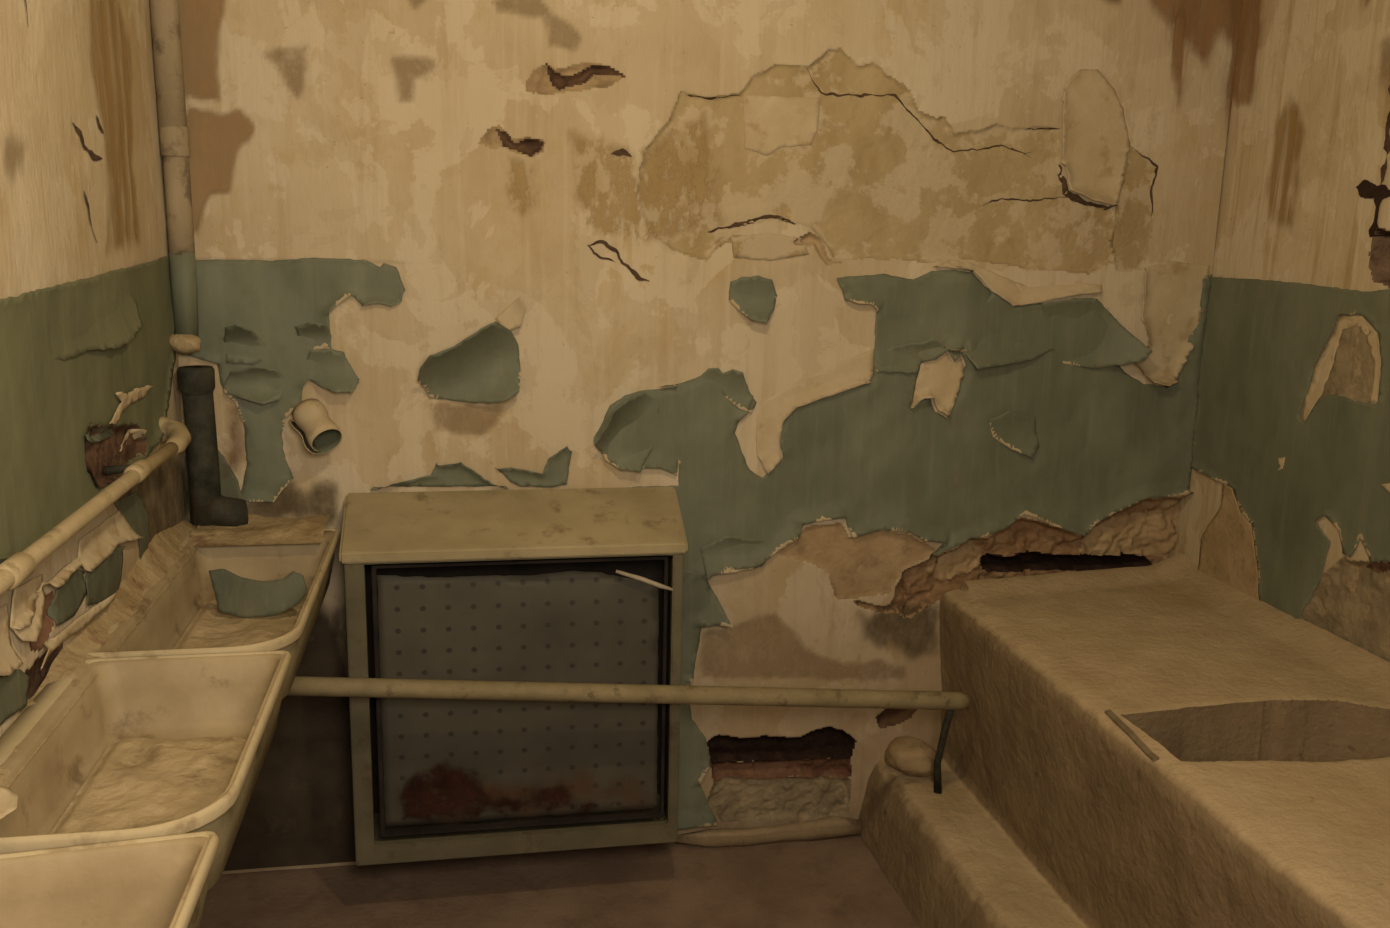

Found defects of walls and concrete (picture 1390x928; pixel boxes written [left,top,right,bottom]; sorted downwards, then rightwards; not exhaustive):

spalling [526,62,625,95]
crack [612,148,632,157]
crack [1356,86,1390,237]
crack [588,240,650,282]
peeling [0,256,405,559]
peeling [418,296,526,404]
peeling [594,47,1390,685]
peeling [0,491,150,726]
peeling [209,569,307,618]
peeling [0,786,18,820]
spalling [678,704,857,830]
spalling [875,709,917,728]